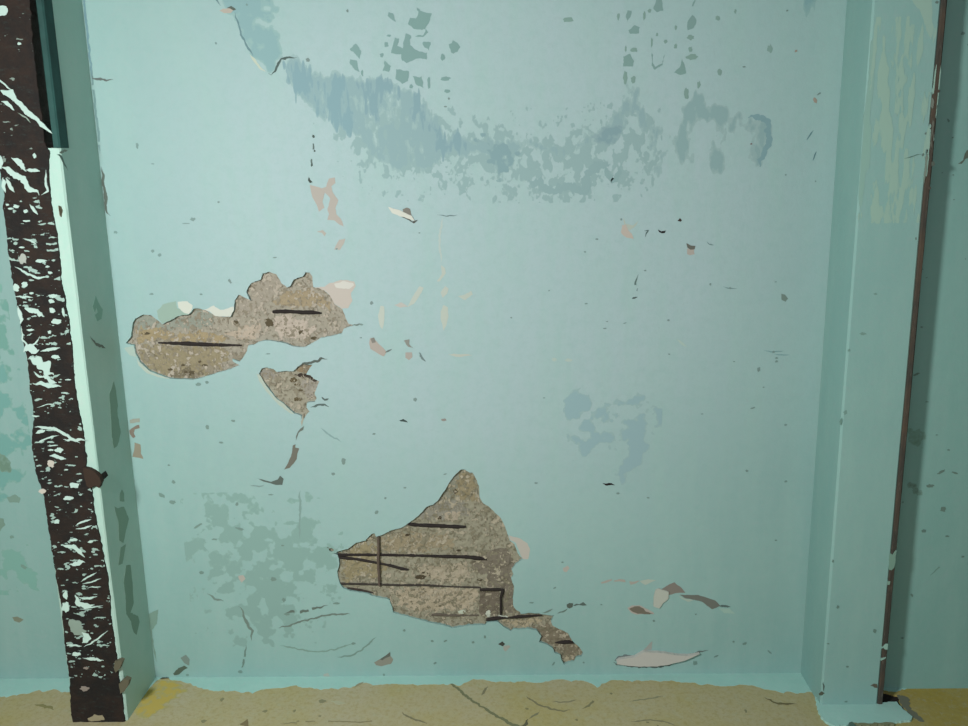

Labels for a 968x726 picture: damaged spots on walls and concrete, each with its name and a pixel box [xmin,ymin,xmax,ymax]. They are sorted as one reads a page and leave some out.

leakage [222,0,773,205]
spalling [124,272,356,379]
leakage [0,284,32,503]
spalling [257,364,319,418]
spalling [327,469,582,662]
peeling [601,579,735,615]
spalling [374,652,393,666]